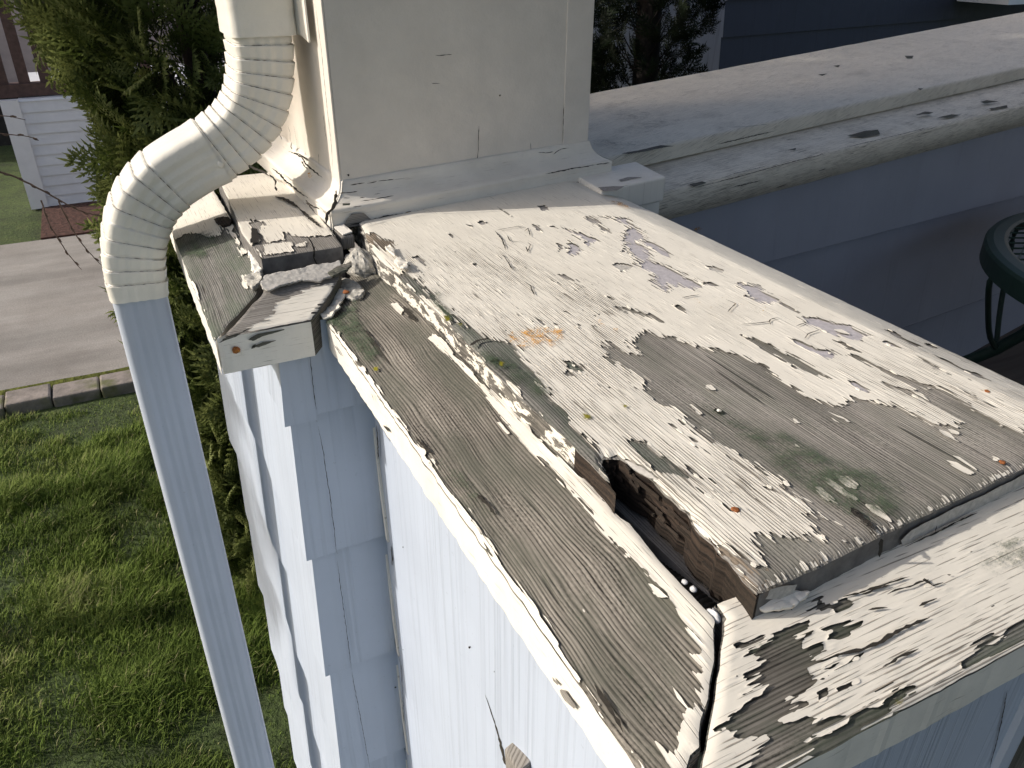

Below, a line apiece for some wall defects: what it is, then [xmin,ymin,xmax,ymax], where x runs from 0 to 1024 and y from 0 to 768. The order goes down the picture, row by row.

crack [249,12,418,264]
peeling [623,145,670,154]
peeling [249,221,342,258]
peeling [343,203,394,251]
peeling [532,217,723,292]
peeling [395,272,609,483]
peeling [601,281,1024,595]
peeling [961,620,1024,669]
peeling [713,597,914,768]